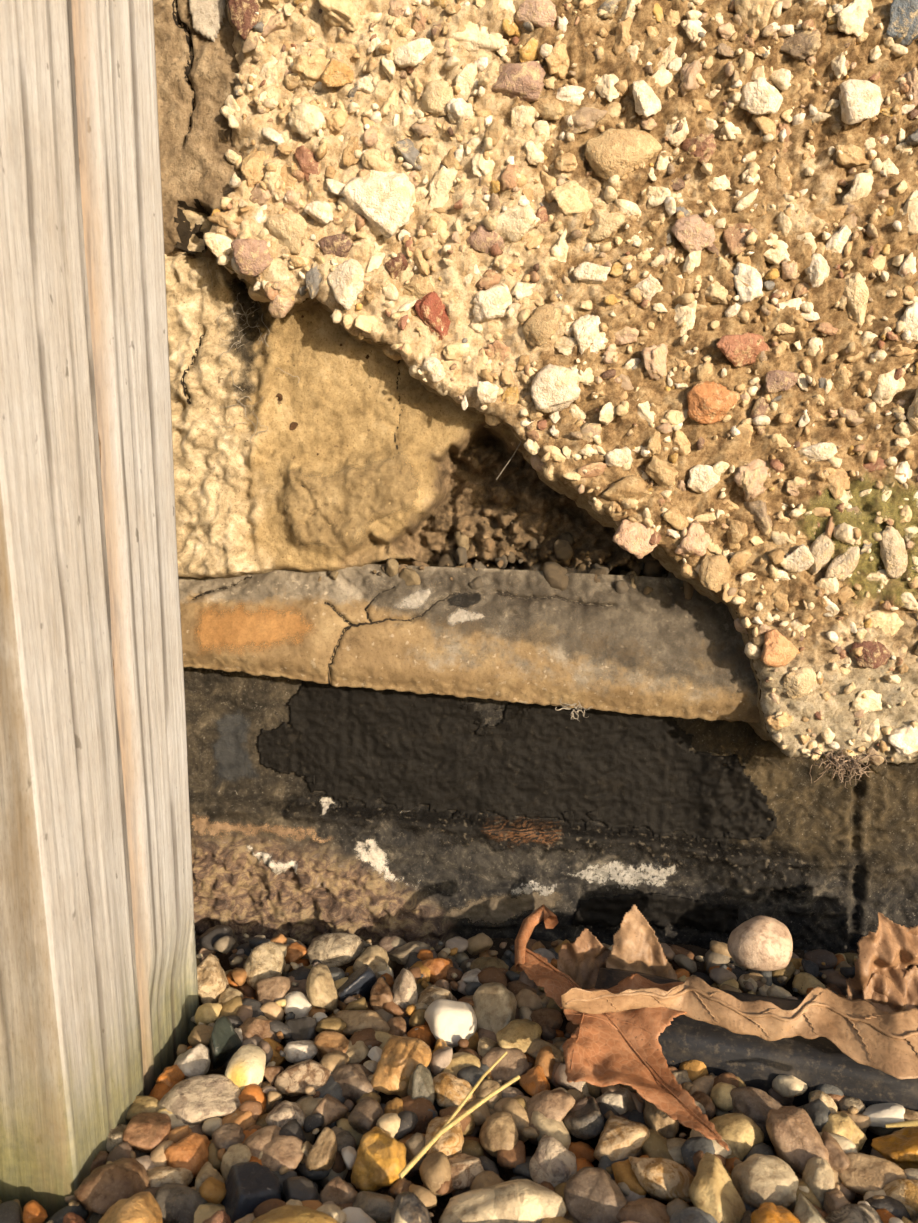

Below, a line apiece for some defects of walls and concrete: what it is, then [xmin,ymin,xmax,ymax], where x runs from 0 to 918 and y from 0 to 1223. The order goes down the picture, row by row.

crack [172,0,195,143]
spalling [220,95,240,120]
spalling [225,149,239,165]
spalling [165,210,784,754]
crack [324,586,461,684]
damp [212,711,258,782]
efflorescence [321,797,334,815]
efflorescence [247,845,298,875]
efflorescence [354,839,404,880]
damp [441,861,676,926]